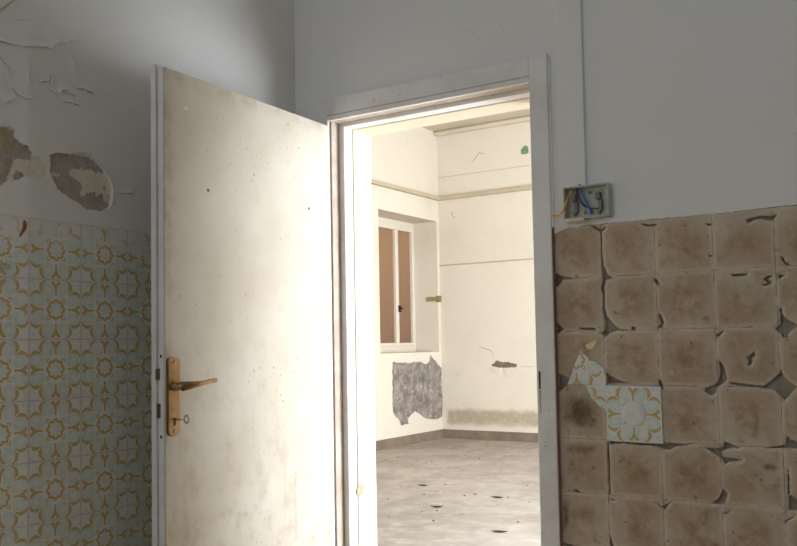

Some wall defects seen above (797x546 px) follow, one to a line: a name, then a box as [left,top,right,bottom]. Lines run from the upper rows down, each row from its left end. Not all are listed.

flaking render [0,114,120,213]
spalling [392,355,443,425]
flaking render [491,361,518,377]
peeling [554,206,797,546]